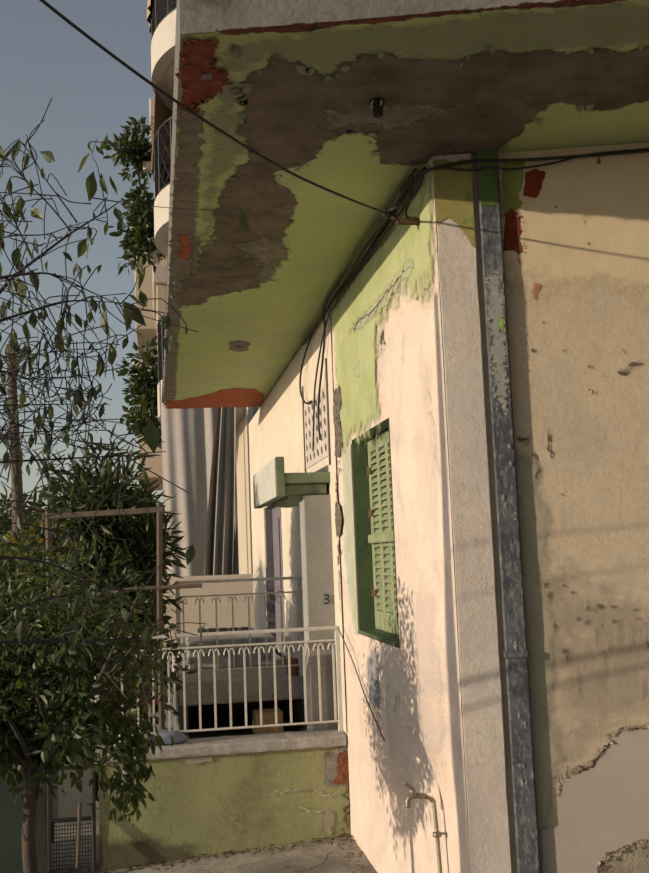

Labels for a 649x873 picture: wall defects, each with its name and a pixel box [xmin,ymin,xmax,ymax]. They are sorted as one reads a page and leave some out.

spalling [162,38,253,404]
corrosion [165,388,265,409]
peeling [331,150,546,633]
spalling [325,747,349,787]